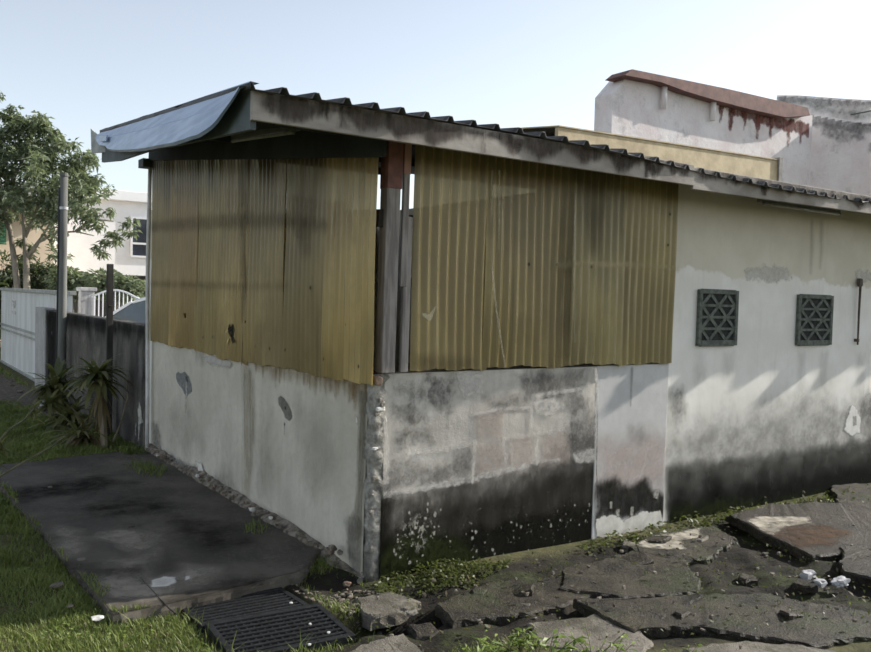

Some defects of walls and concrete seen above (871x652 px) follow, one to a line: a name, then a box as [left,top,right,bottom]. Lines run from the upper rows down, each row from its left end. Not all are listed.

water stain [265,94,689,177]
water stain [699,170,743,184]
peeling [844,405,861,436]
spalling [355,374,390,582]
water stain [379,374,871,579]
peeling [393,502,451,564]